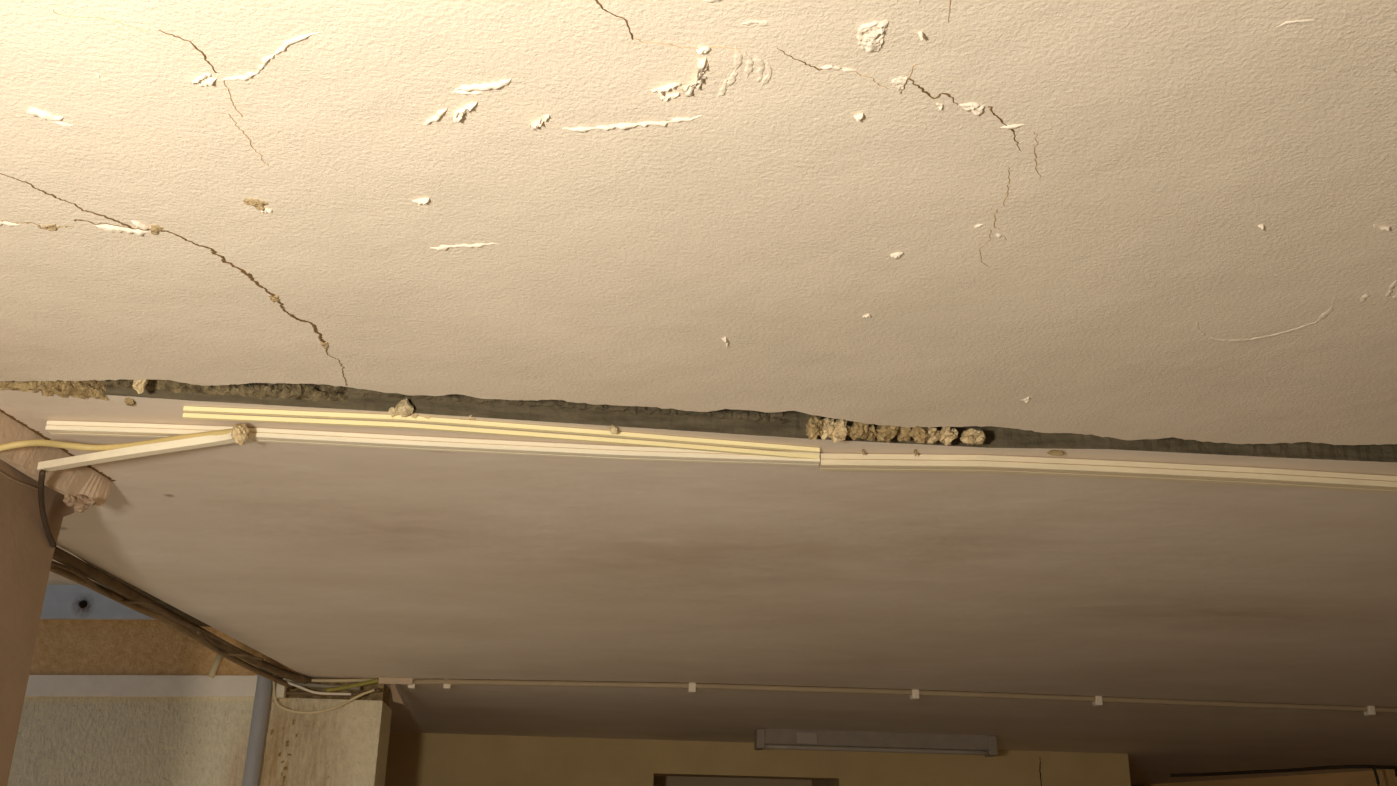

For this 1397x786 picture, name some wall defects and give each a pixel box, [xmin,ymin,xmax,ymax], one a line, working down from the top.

crack [53,10,269,166]
crack [595,0,741,49]
crack [777,48,1041,266]
crack [0,173,348,386]
crack [0,409,116,481]